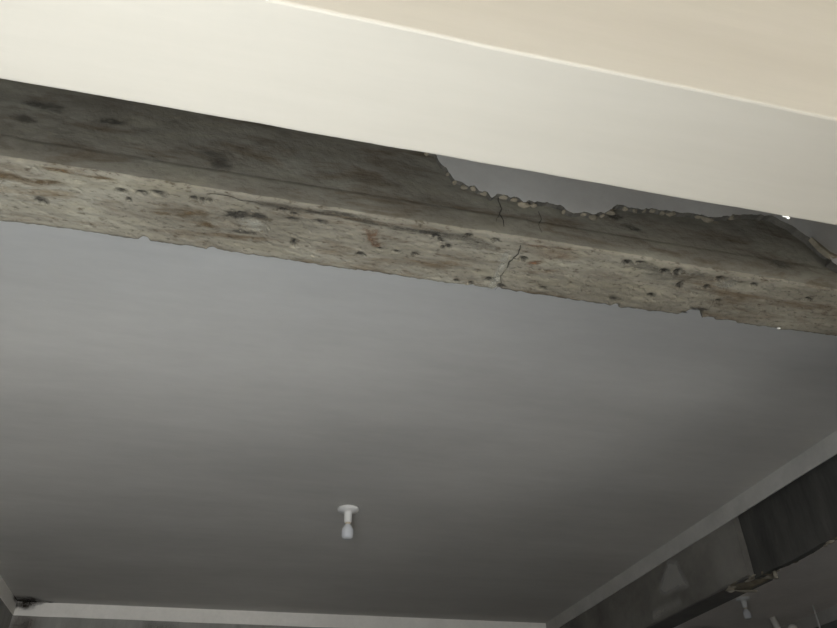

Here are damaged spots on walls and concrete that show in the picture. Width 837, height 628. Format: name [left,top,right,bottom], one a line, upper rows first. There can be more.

crack [490,245,521,290]
peeling [419,151,837,273]